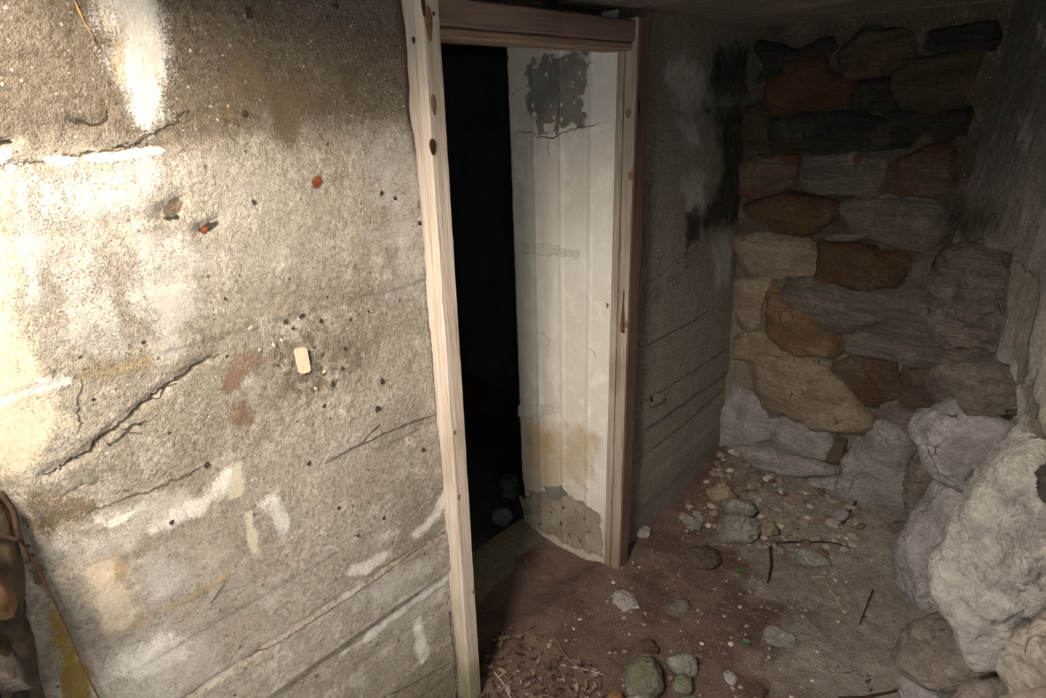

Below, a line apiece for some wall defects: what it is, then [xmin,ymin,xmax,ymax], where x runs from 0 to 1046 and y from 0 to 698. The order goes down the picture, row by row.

peeling [523,51,596,137]
leakage [657,36,750,296]
crack [45,353,219,474]
crack [79,466,203,515]
spalling [519,486,603,556]